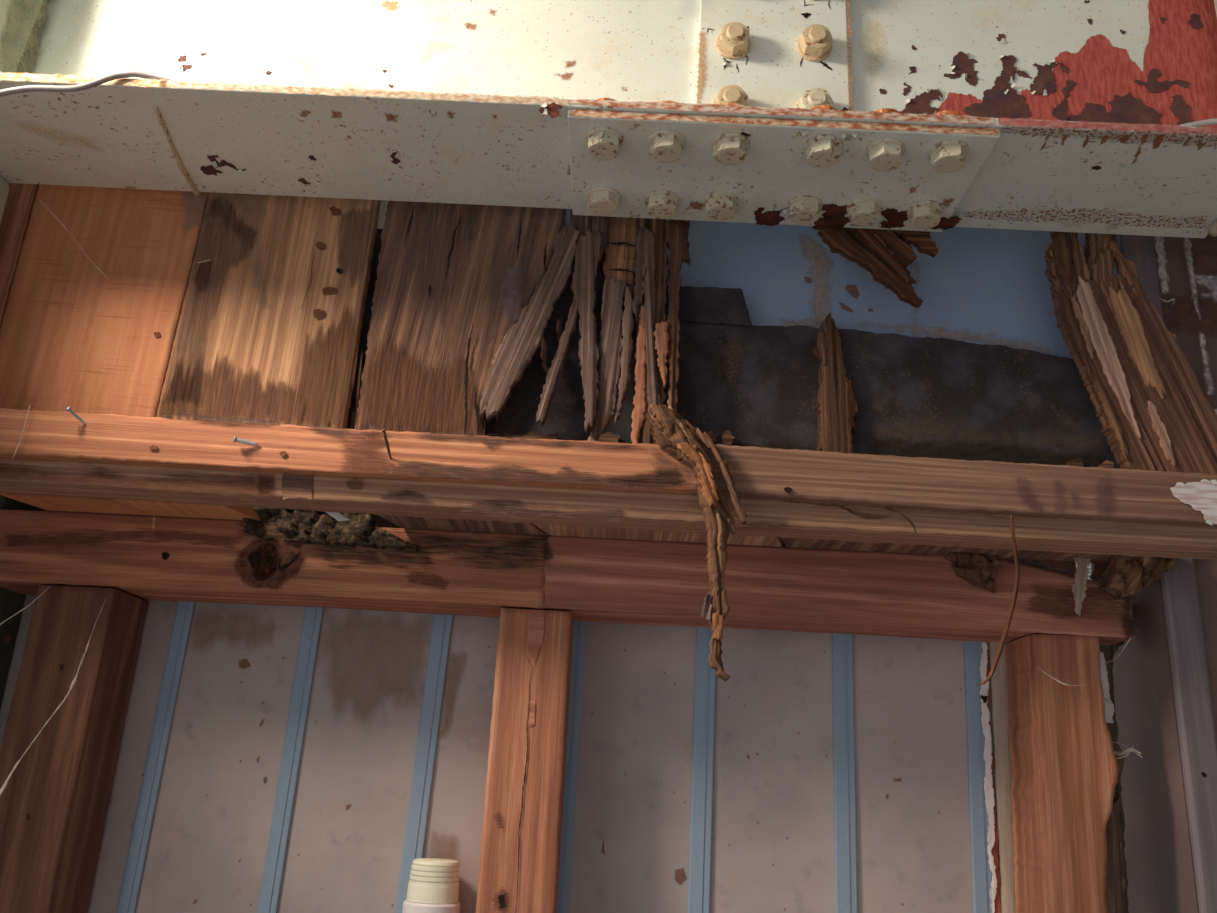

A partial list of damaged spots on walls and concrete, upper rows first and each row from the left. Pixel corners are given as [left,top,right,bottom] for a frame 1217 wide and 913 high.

peeling [893,0,1217,127]
rust [0,32,1217,164]
rust [754,207,787,228]
rust [812,203,850,231]
rust [877,208,908,229]
leakage [154,191,695,503]
peeling [1170,479,1217,525]
leakage [1,520,552,588]
crack [515,653,533,913]